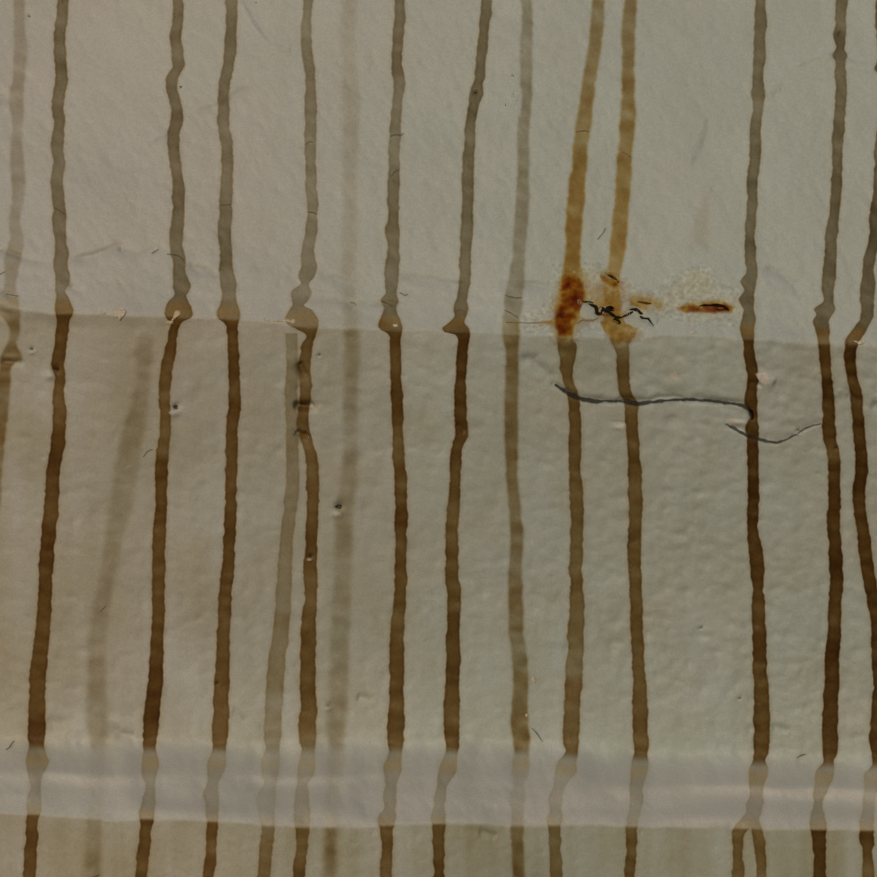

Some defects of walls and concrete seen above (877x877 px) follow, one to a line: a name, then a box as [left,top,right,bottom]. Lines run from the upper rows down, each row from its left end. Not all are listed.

water stain [0,0,31,524]
water stain [19,0,77,877]
water stain [80,0,196,877]
water stain [199,0,245,877]
water stain [253,0,364,877]
water stain [374,0,412,877]
water stain [427,0,496,877]
water stain [499,0,536,877]
corrosion [521,0,741,877]
crack [554,383,821,444]
water stain [728,0,774,877]
water stain [806,0,877,877]